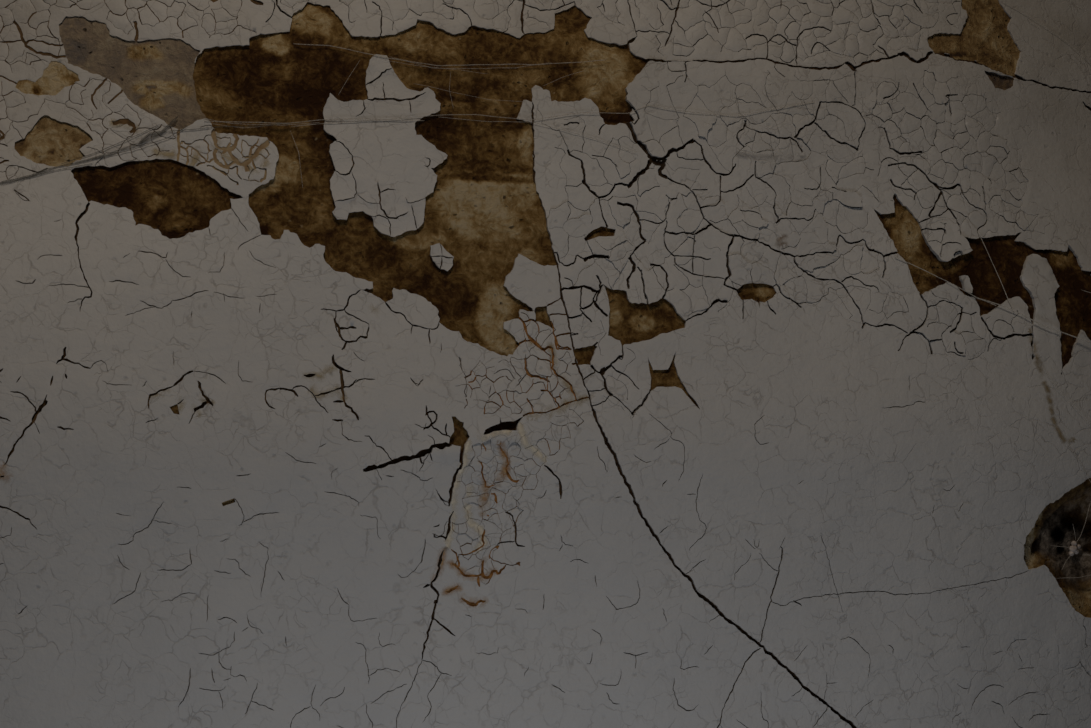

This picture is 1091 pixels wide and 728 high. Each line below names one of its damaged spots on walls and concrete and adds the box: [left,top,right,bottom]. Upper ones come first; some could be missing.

peeling [927,0,1020,90]
crack [0,0,308,317]
peeling [15,2,672,356]
crack [0,347,249,477]
peeling [574,346,596,365]
peeling [604,286,685,346]
peeling [648,355,699,408]
crack [265,0,1091,728]
peeling [874,194,1091,368]
crack [0,506,37,564]
crack [113,474,345,728]
spalling [1024,478,1091,618]